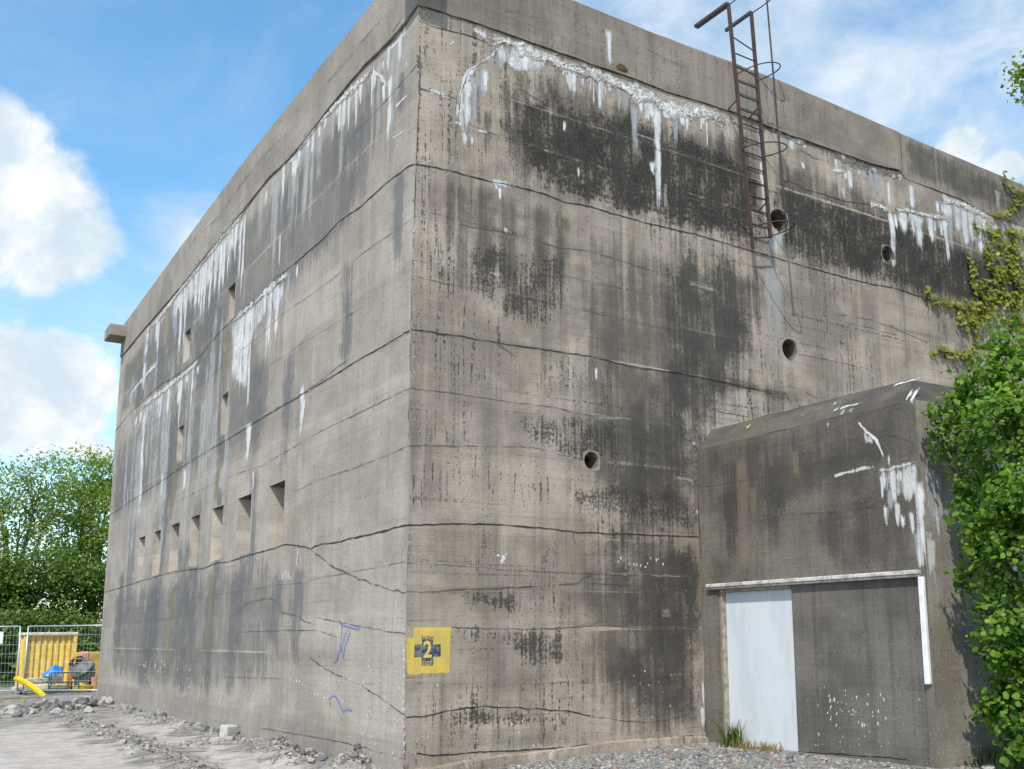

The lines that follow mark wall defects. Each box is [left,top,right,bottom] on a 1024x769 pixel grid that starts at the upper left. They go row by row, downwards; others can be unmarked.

leakage [429,28,1019,323]
leakage [113,25,407,687]
crack [106,503,704,648]
crack [262,728,589,759]
crack [310,658,693,739]
leakage [585,535,705,728]
leakage [723,422,943,591]